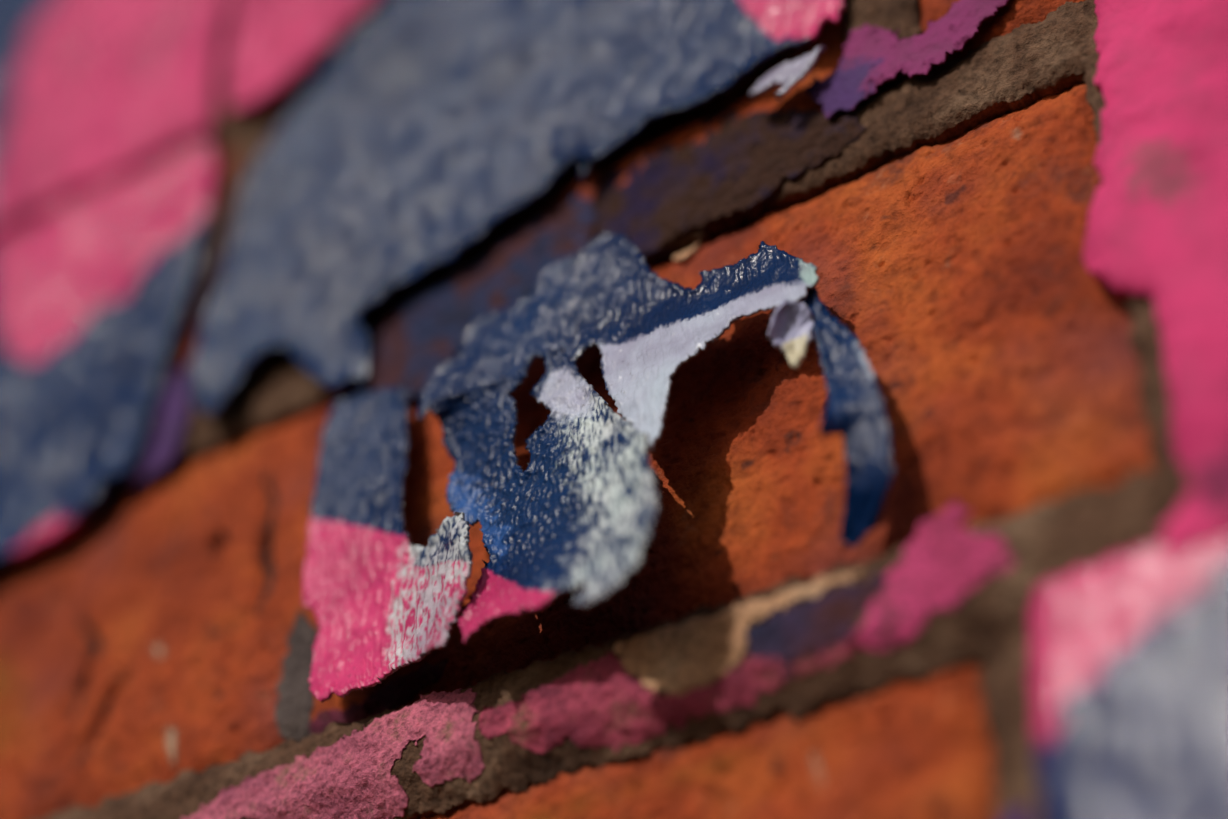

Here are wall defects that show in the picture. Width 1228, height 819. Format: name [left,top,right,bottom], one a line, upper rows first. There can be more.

peeling [302,0,1010,703]